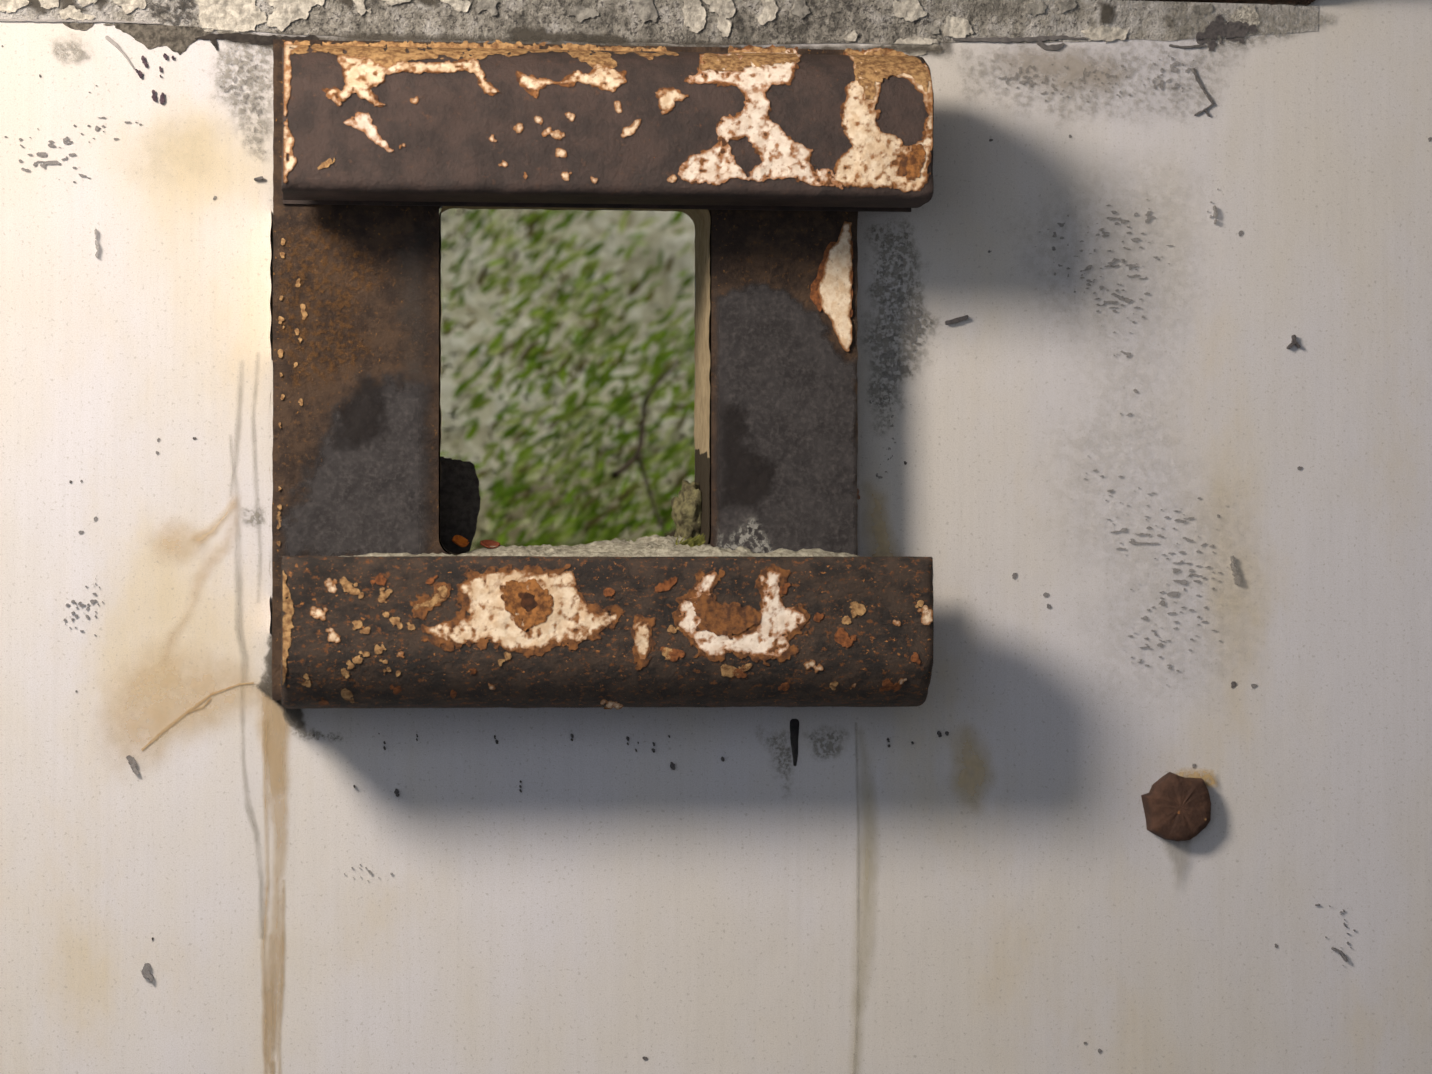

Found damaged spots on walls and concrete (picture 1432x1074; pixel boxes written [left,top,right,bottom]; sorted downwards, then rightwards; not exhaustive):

leakage [868,225,935,479]
spalling [518,592,538,612]